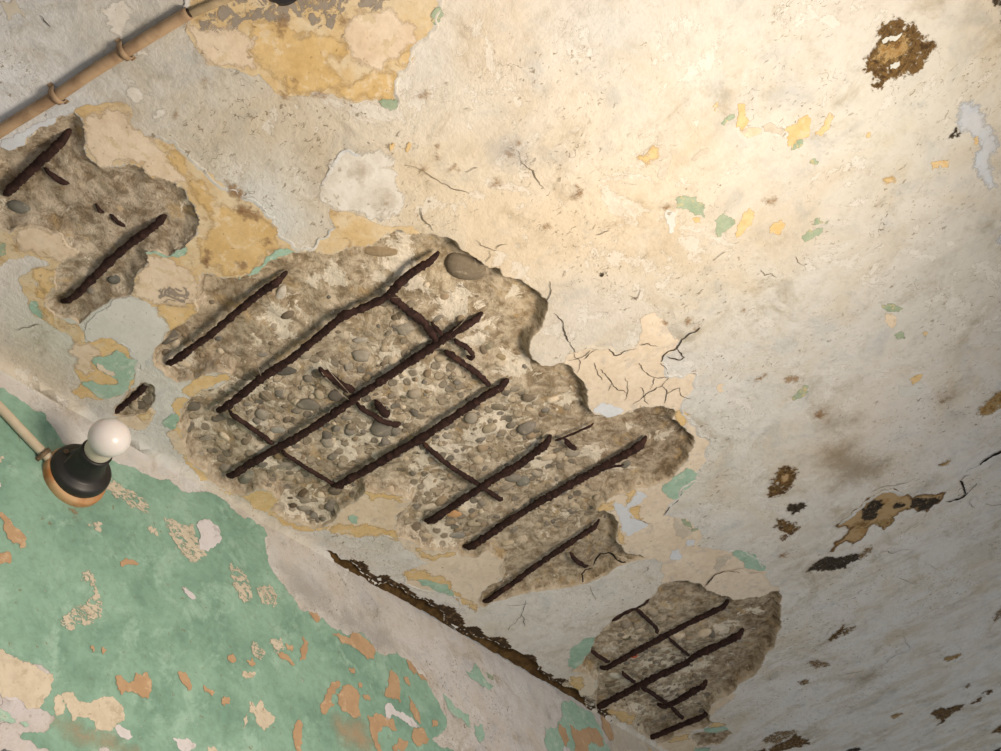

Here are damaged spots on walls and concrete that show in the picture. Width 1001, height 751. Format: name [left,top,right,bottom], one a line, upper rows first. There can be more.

peeling [100,0,134,39]
peeling [183,0,444,111]
peeling [721,103,833,150]
peeling [956,101,1000,189]
rust [44,167,70,185]
rust [95,203,126,227]
peeling [802,218,828,242]
crack [546,282,700,404]
peeling [785,376,809,401]
spalling [0,83,782,751]
rust [555,423,594,441]